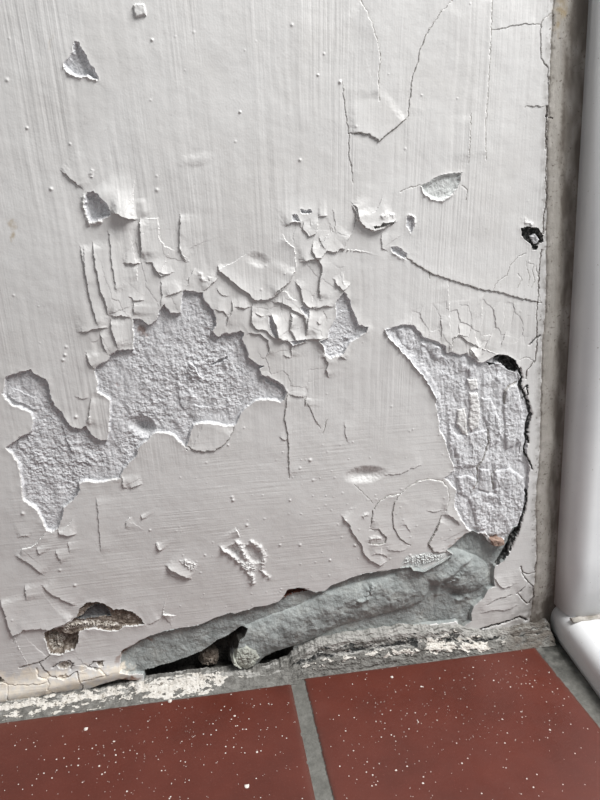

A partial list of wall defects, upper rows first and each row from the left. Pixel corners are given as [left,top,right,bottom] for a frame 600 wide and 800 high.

flaking render [62,41,99,81]
crack [342,0,453,181]
flaking render [400,172,468,202]
crack [405,0,553,469]
flaking render [521,216,544,250]
peeling [0,199,368,654]
flaking render [119,297,534,678]
crack [354,478,450,546]
crack [479,488,537,630]
water stain [0,661,138,702]